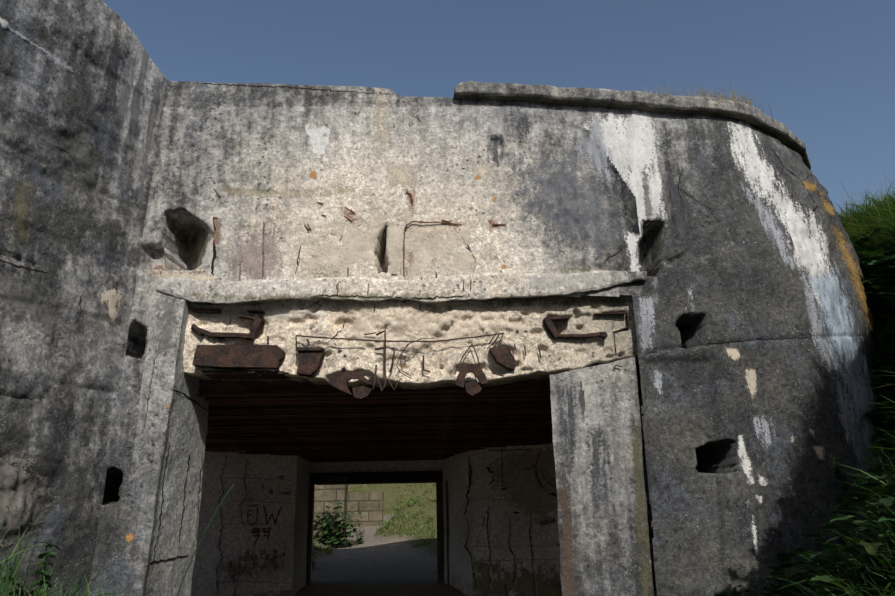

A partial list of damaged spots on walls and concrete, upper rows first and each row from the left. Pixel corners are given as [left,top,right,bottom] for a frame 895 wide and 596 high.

crack [0,259,48,273]
spalling [288,89,527,392]
damp [487,109,691,289]
damp [727,118,885,482]
crack [464,463,535,596]